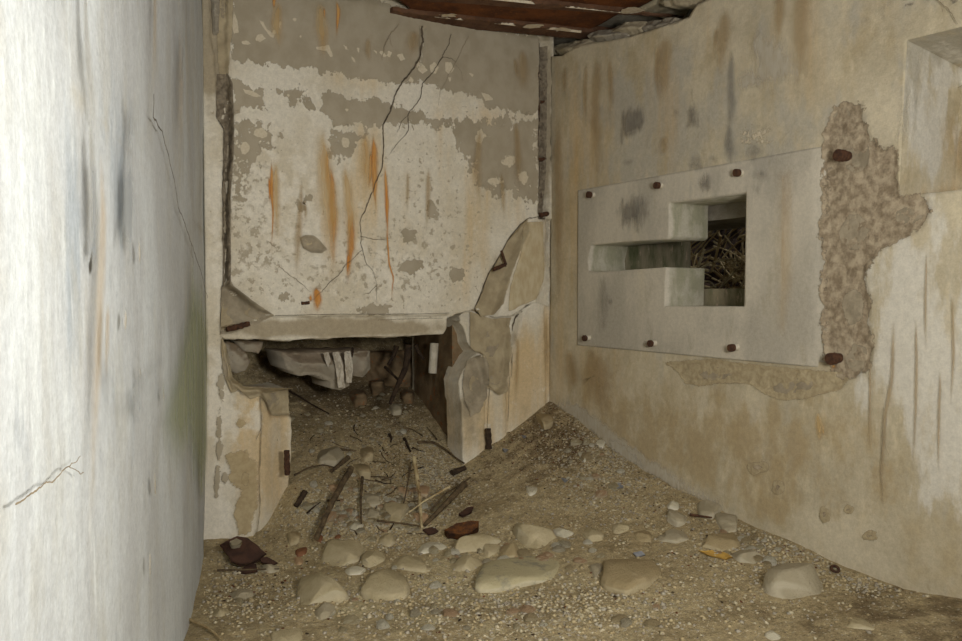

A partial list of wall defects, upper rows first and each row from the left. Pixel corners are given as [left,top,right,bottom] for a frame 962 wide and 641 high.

peeling [639,0,689,19]
crack [153,106,207,294]
corrosion [309,289,321,308]
corrosion [326,155,336,243]
crack [267,24,469,320]
peeling [213,0,548,535]
corrosion [369,140,394,288]
flaking render [666,101,933,401]
water stain [882,341,894,462]
water stain [915,262,927,425]
water stain [938,305,955,450]